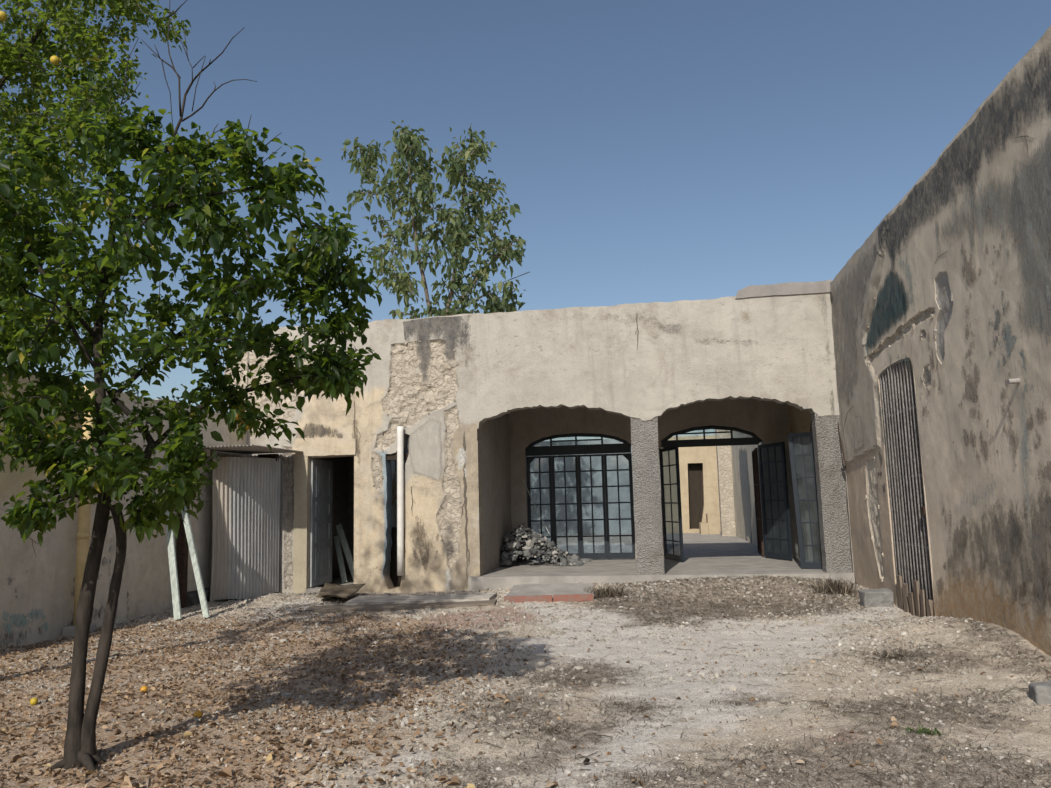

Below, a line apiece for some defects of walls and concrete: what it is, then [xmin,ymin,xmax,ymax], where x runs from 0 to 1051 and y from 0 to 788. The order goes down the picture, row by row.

spalling [371,339,467,591]
damp [823,50,1051,427]
spalling [864,230,1047,472]
damp [948,397,1051,618]